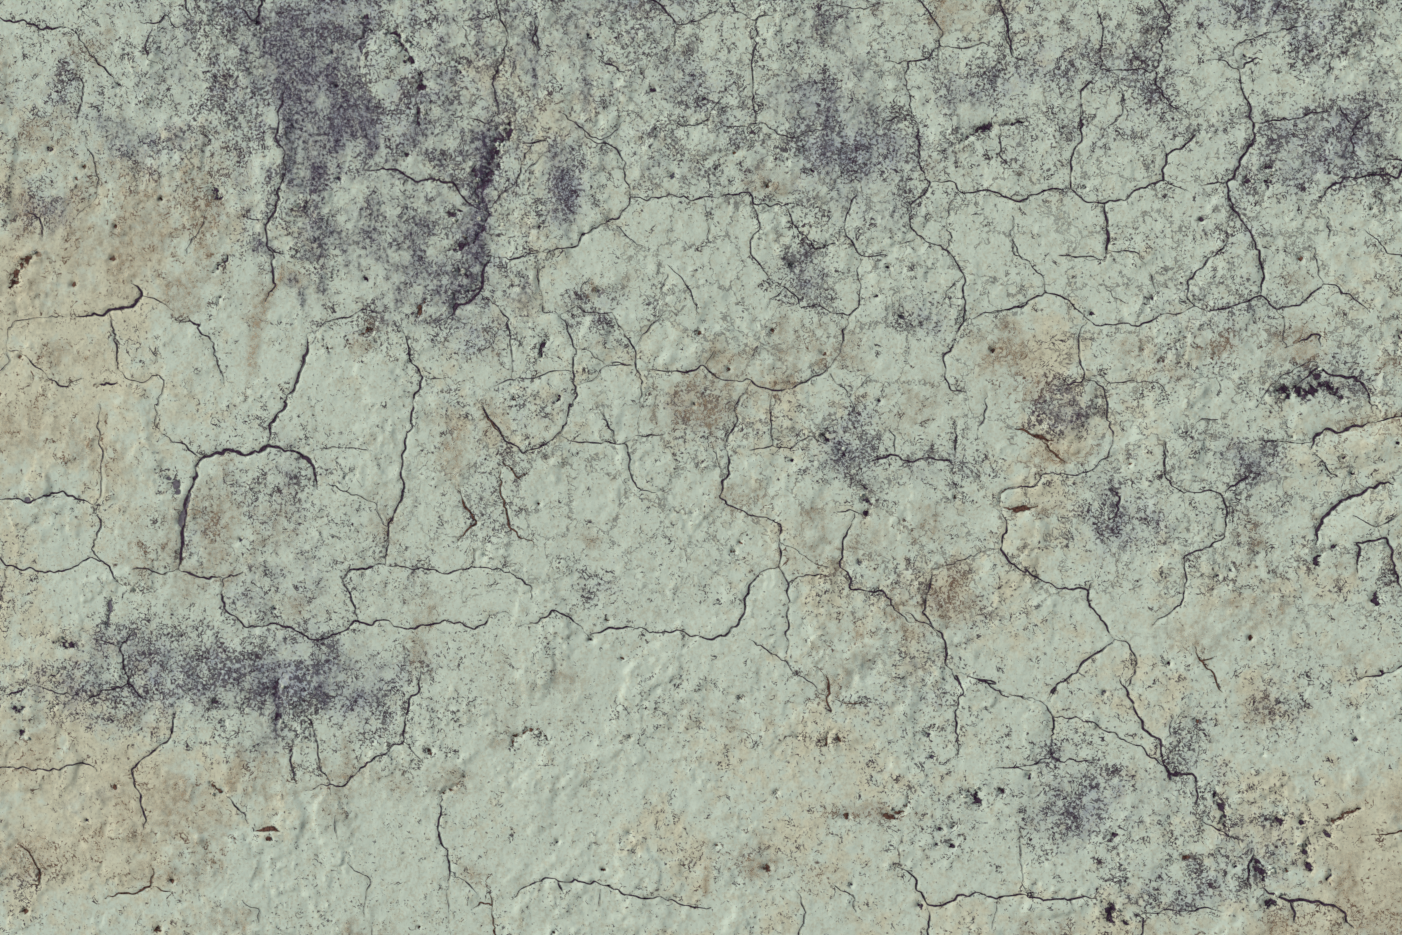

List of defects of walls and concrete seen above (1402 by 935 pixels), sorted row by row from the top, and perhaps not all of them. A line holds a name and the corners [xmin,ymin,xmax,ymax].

crack [0,1,120,215]
crack [243,86,287,301]
water stain [244,13,491,309]
crack [369,139,546,211]
crack [462,0,553,124]
crack [652,0,831,138]
crack [881,0,1402,490]
crack [0,283,532,641]
crack [437,113,1354,935]
crack [1353,515,1401,588]
crack [0,630,176,830]
crack [289,672,422,935]